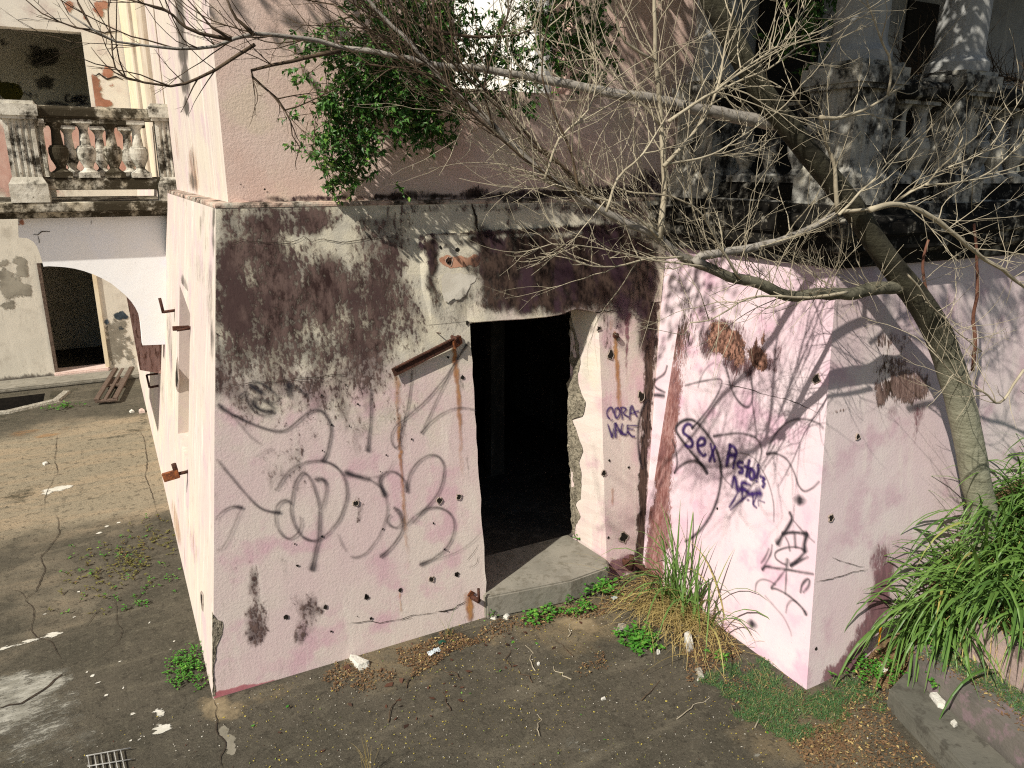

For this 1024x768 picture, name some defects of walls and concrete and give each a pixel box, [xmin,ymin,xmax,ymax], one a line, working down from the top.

peeling [0,256,32,310]
peeling [439,246,480,303]
corrosion [391,335,463,427]
damp [208,170,664,577]
spalling [707,321,768,371]
spalling [875,334,931,407]
spalling [566,318,585,535]
spalling [200,591,223,697]
mould [244,569,269,647]
mould [294,597,323,642]
crack [348,601,466,624]